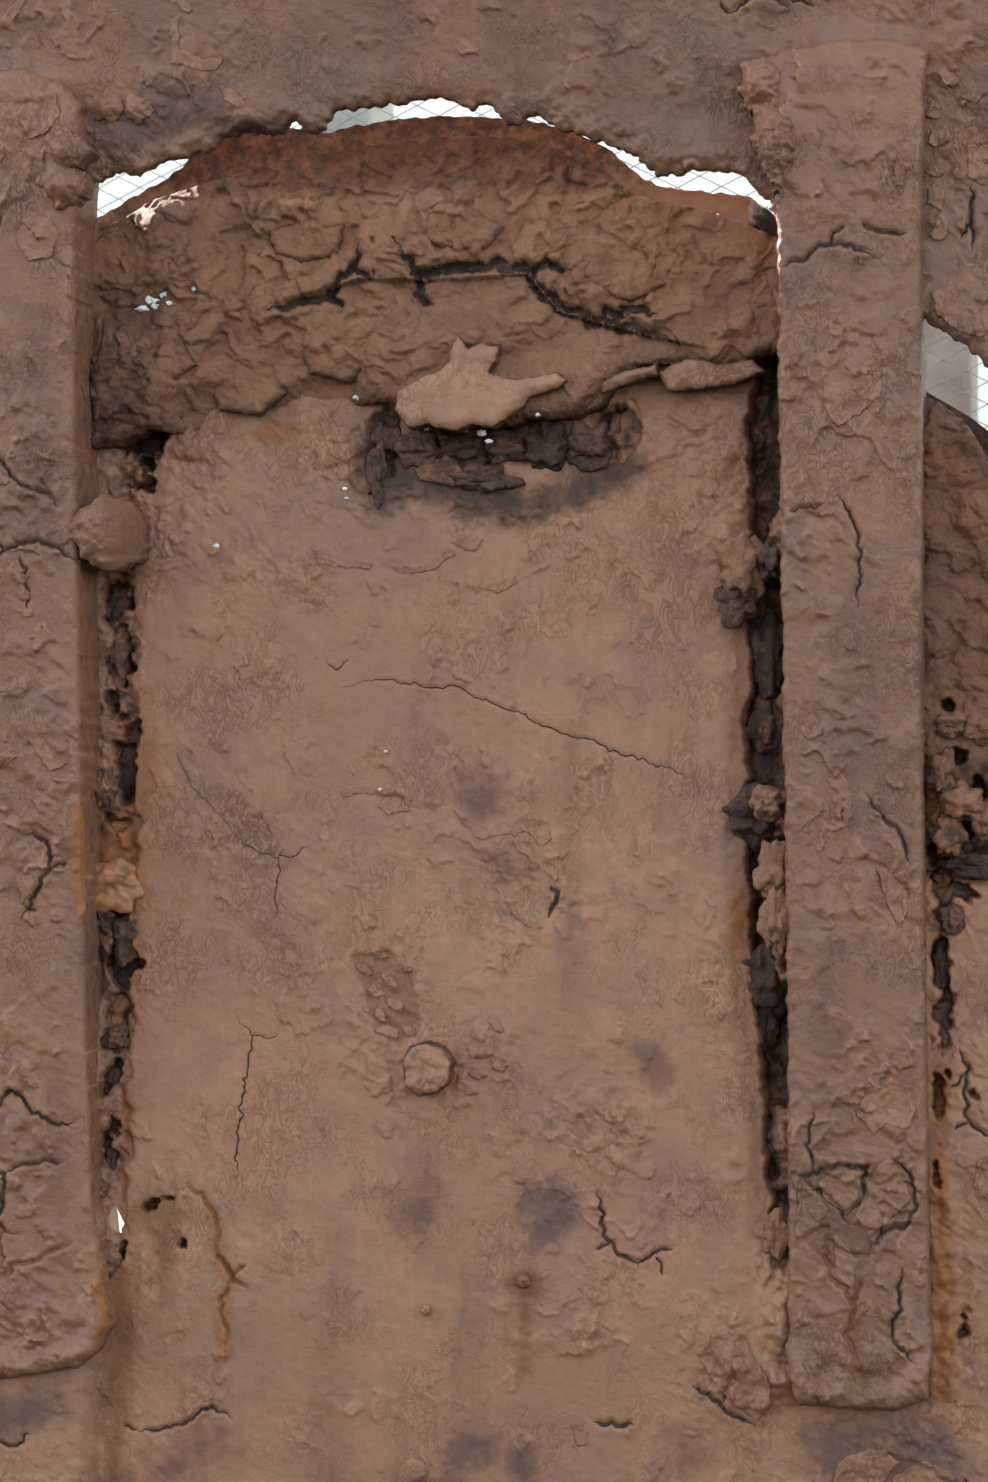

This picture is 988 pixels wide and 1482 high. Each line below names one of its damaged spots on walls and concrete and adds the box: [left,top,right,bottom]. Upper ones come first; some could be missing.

crack [327,660,702,781]
rust [923,396,988,990]
rust [73,585,151,1094]
crack [260,811,308,916]
crack [0,1089,76,1278]
rust [105,1239,122,1279]
rust [100,1103,128,1200]
crack [789,1109,919,1384]
rust [933,1024,950,1204]